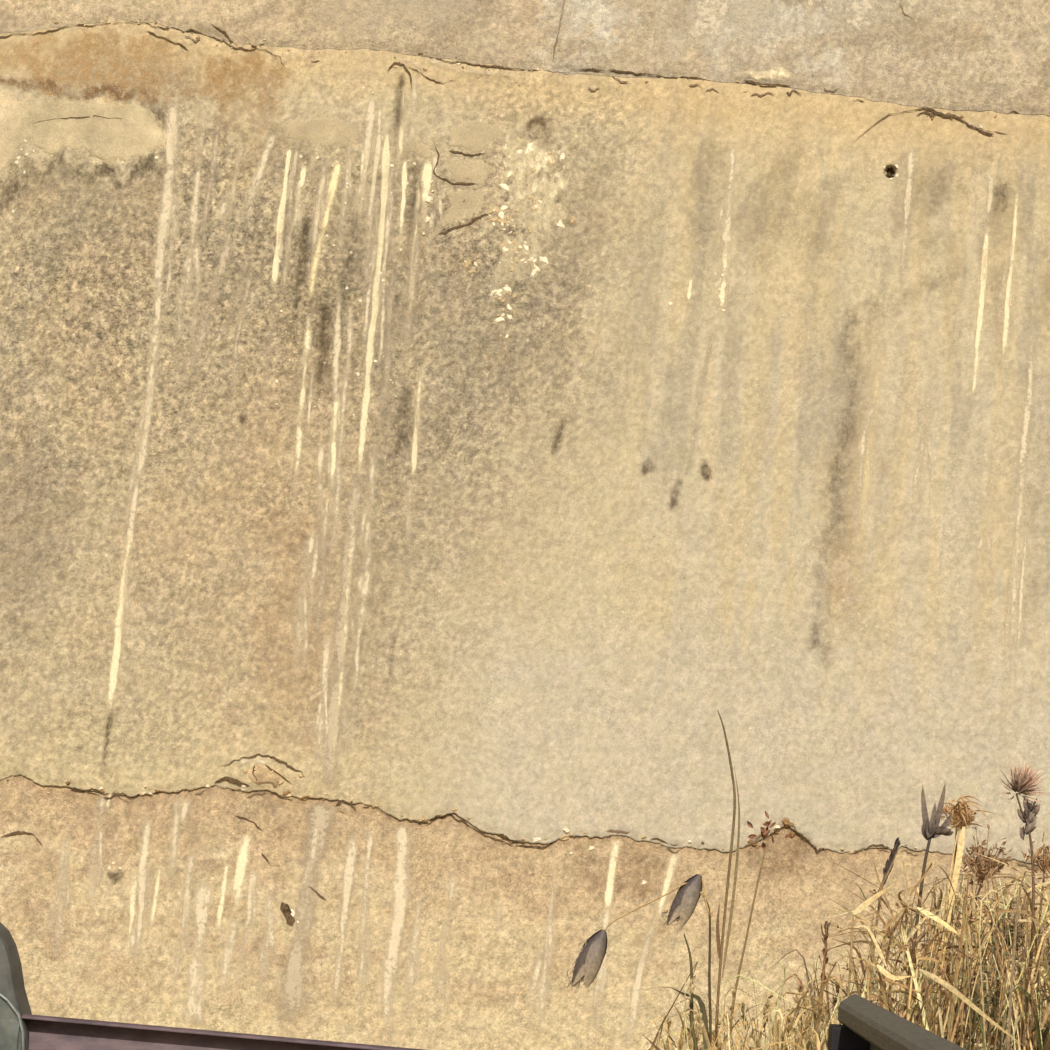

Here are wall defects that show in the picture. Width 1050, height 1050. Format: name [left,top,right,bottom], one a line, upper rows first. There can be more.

rust [0,38,163,99]
crack [0,22,283,64]
crack [388,0,789,91]
flaking render [0,90,166,205]
flaking render [389,120,577,339]
damp [104,78,442,783]
crack [214,753,304,791]
crack [426,814,557,849]
spalling [744,818,826,854]
damp [128,801,275,1022]
damp [382,826,420,1026]
damp [593,840,620,1028]